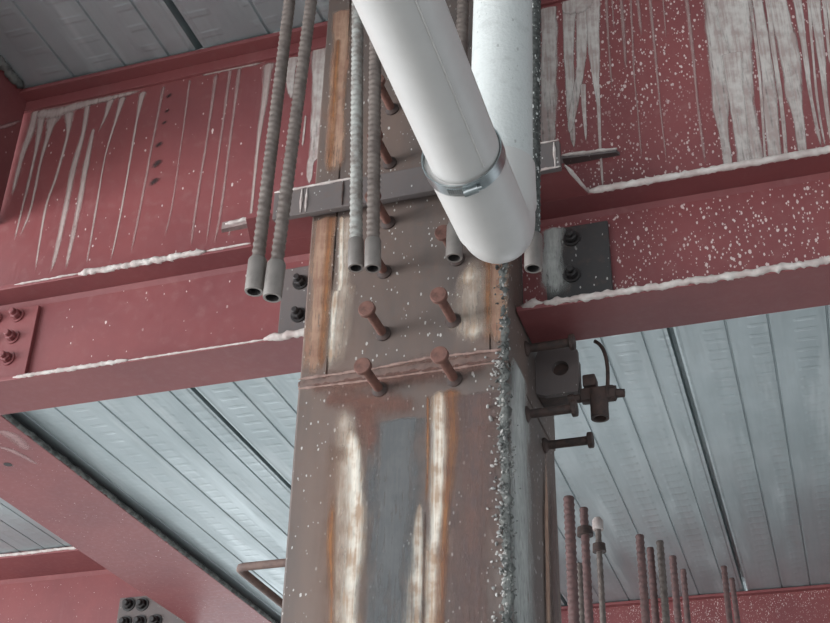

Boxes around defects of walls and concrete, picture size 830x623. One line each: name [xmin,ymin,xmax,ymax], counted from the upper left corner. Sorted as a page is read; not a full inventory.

water stain [13,91,145,267]
water stain [133,87,164,242]
water stain [192,63,273,232]
rust [326,10,349,169]
water stain [540,0,641,185]
water stain [649,0,666,153]
water stain [685,0,704,151]
water stain [704,0,830,164]
rust [304,217,336,370]
water stain [335,415,364,623]
water stain [406,392,448,623]
rust [436,390,458,623]